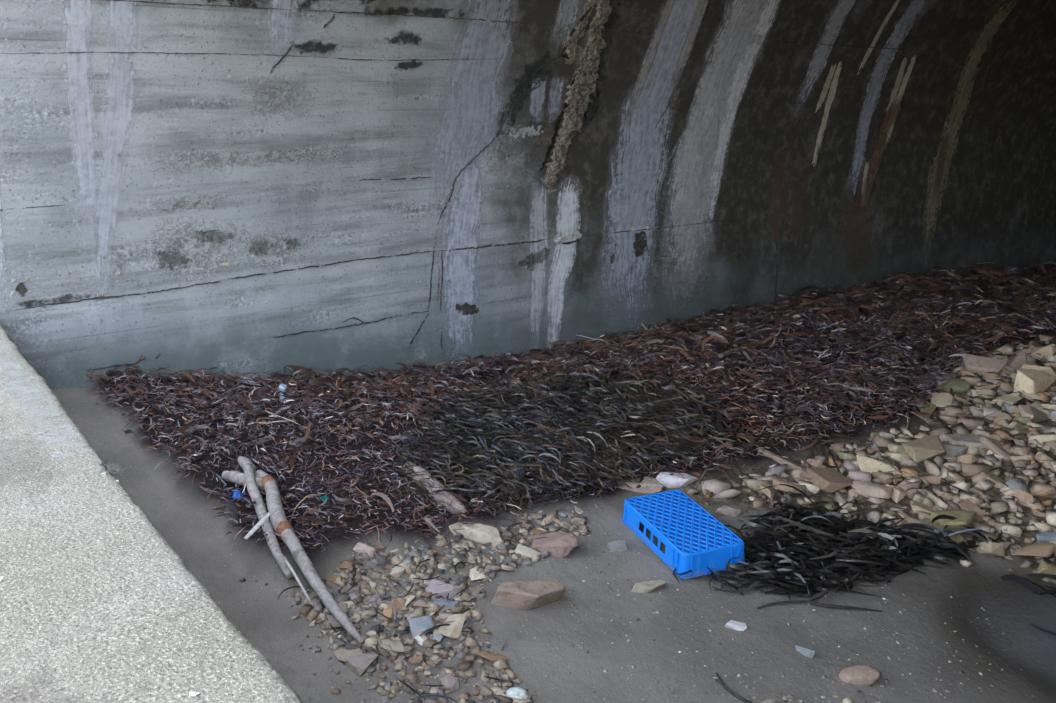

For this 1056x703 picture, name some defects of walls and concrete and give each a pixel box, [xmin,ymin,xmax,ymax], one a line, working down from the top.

damp [65,0,135,279]
damp [228,0,336,54]
crack [3,0,655,348]
damp [363,0,563,349]
damp [581,0,621,130]
crack [589,220,736,236]
damp [602,0,780,318]
damp [805,0,855,169]
damp [850,0,926,203]